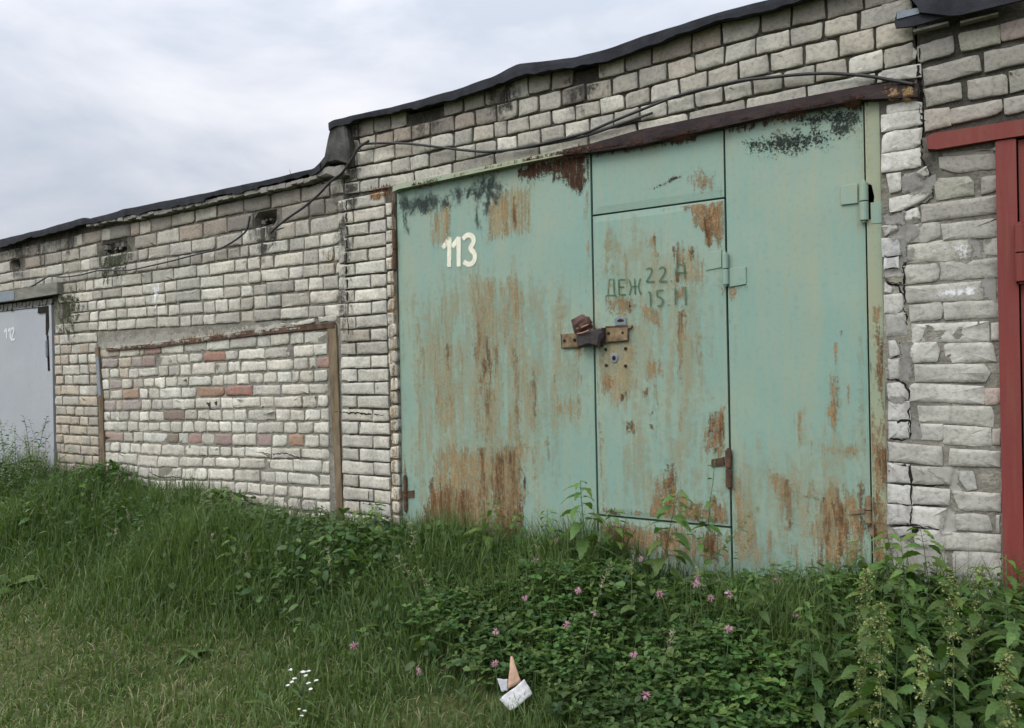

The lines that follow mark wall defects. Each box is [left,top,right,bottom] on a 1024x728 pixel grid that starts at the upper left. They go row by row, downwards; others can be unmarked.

rust [884,85,920,103]
rust [453,93,867,250]
rust [606,261,660,327]
rust [672,244,703,374]
rust [418,277,550,538]
rust [599,341,663,429]
rust [704,406,725,458]
rust [771,308,890,571]
crack [884,246,947,538]
rust [595,464,772,568]